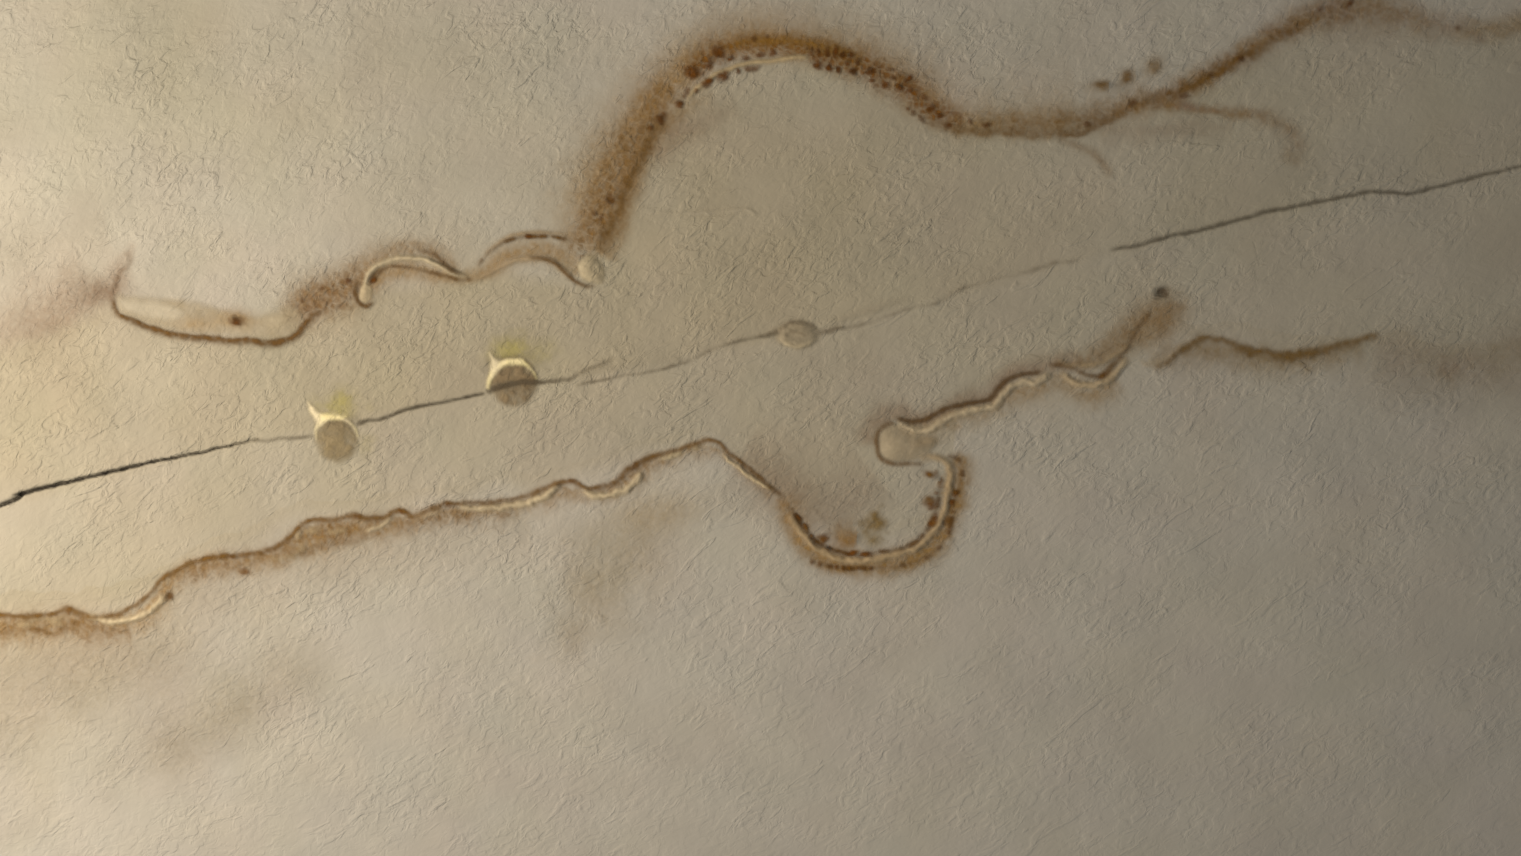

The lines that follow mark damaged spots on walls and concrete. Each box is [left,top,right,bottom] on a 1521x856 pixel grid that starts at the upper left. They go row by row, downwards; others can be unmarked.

water stain [496,31,993,285]
crack [1118,172,1494,248]
water stain [89,256,460,346]
crack [359,380,555,424]
water stain [874,303,1172,465]
water stain [1240,336,1368,361]
crack [0,444,236,507]
water stain [0,439,965,635]